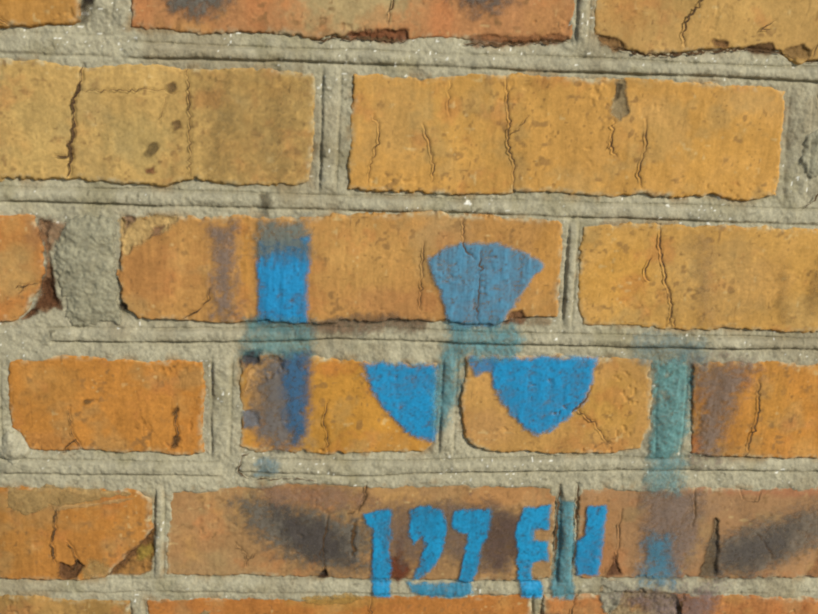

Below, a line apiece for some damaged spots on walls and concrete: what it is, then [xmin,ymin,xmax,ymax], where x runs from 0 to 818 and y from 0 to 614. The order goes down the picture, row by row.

crack [58,66,192,176]
crack [506,78,528,193]
peeling [610,78,629,120]
crack [638,130,648,186]
spalling [22,218,64,319]
crack [462,221,484,323]
crack [645,228,676,325]
spalling [59,529,155,580]
spalling [600,556,681,614]